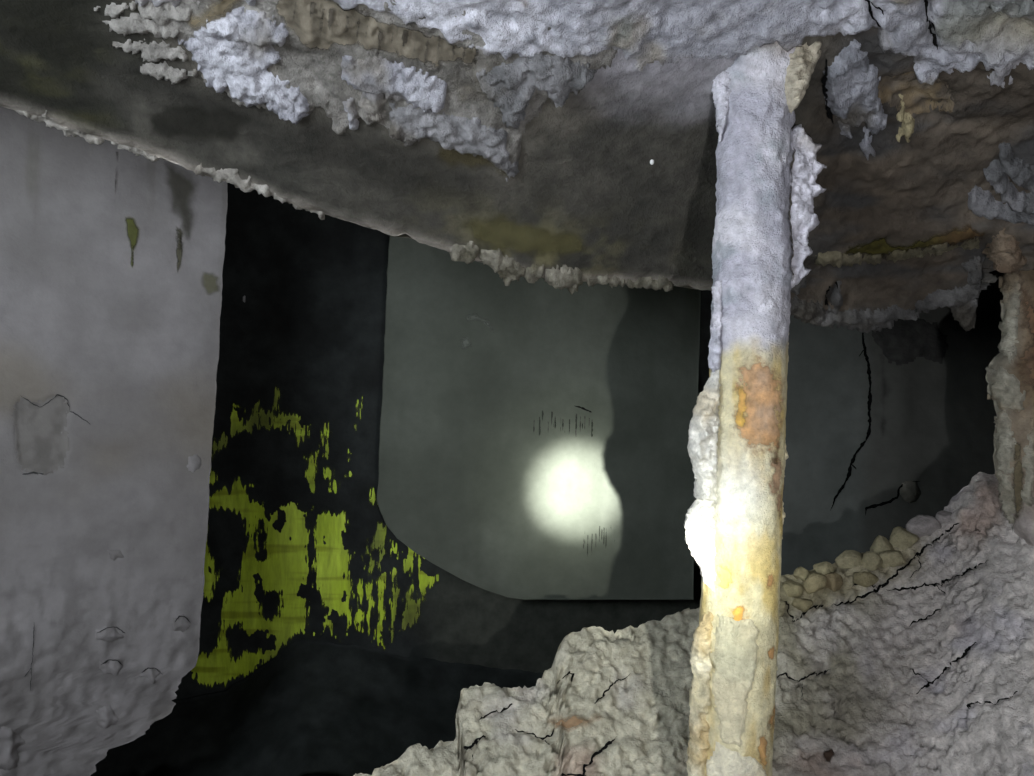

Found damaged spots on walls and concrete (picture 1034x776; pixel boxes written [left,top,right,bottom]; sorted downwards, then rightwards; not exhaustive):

crack [865,0,884,27]
crack [924,0,938,50]
peeling [94,0,598,181]
water stain [135,0,1034,177]
rust [735,362,783,512]
crack [830,332,872,511]
crack [785,523,987,626]
crack [595,674,630,704]
crack [912,642,977,694]
crack [966,691,1018,708]
crack [464,703,554,757]
crack [560,739,615,776]